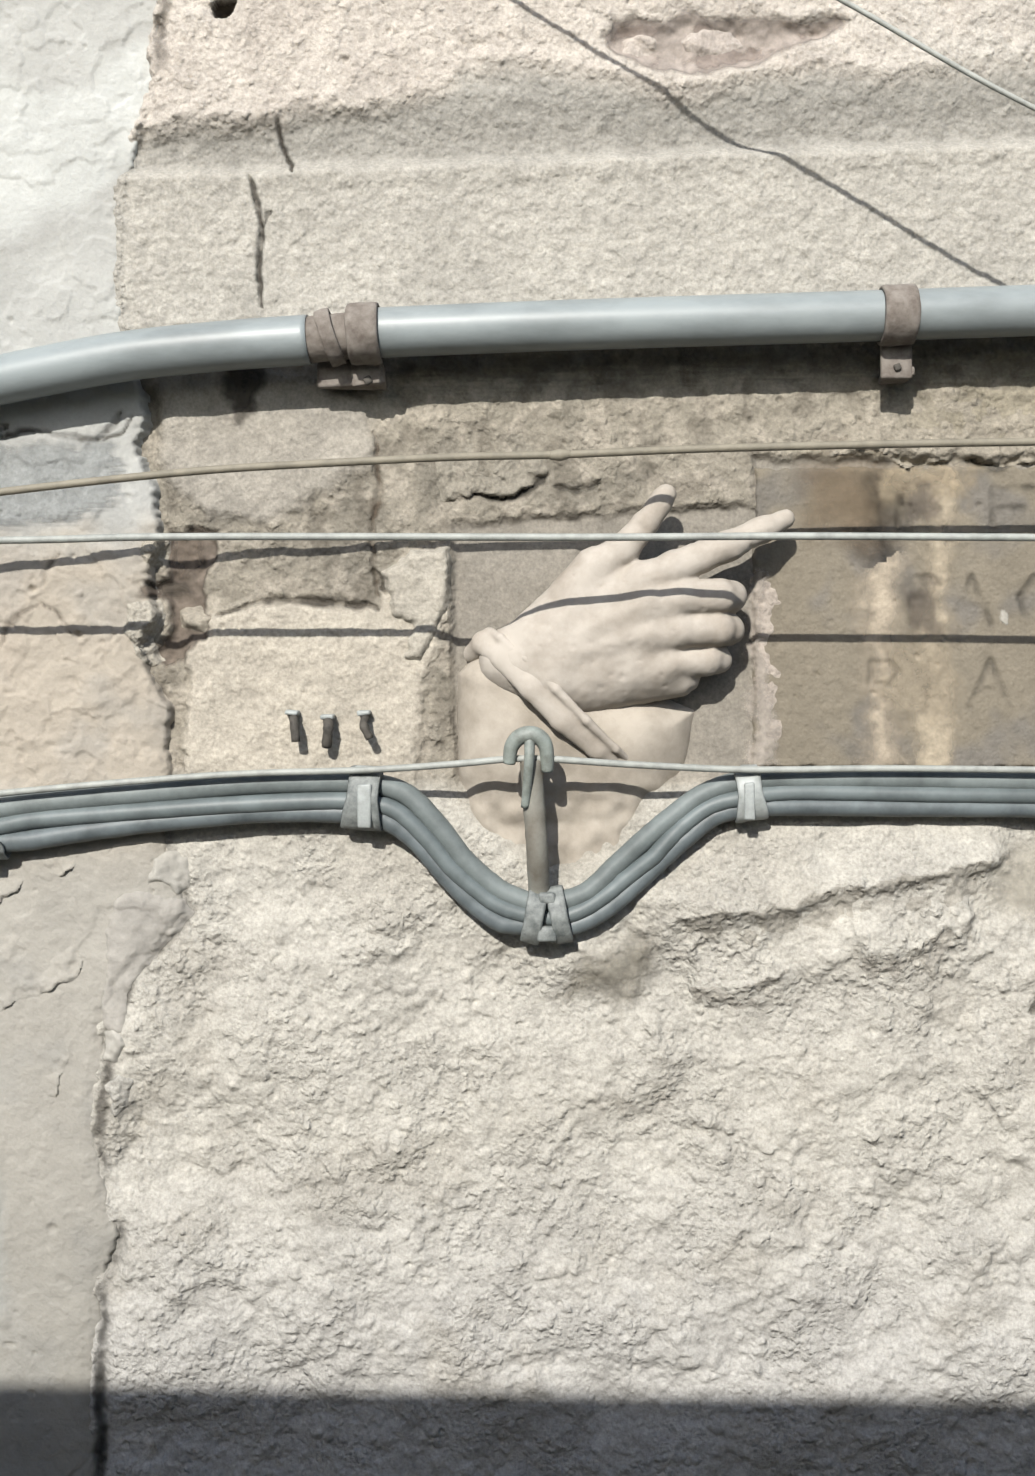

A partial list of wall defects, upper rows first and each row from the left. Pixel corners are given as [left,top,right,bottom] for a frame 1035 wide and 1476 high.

spalling [605,11,844,74]
crack [278,125,294,172]
crack [250,180,266,306]
leakage [882,466,960,765]
crack [97,1060,111,1154]